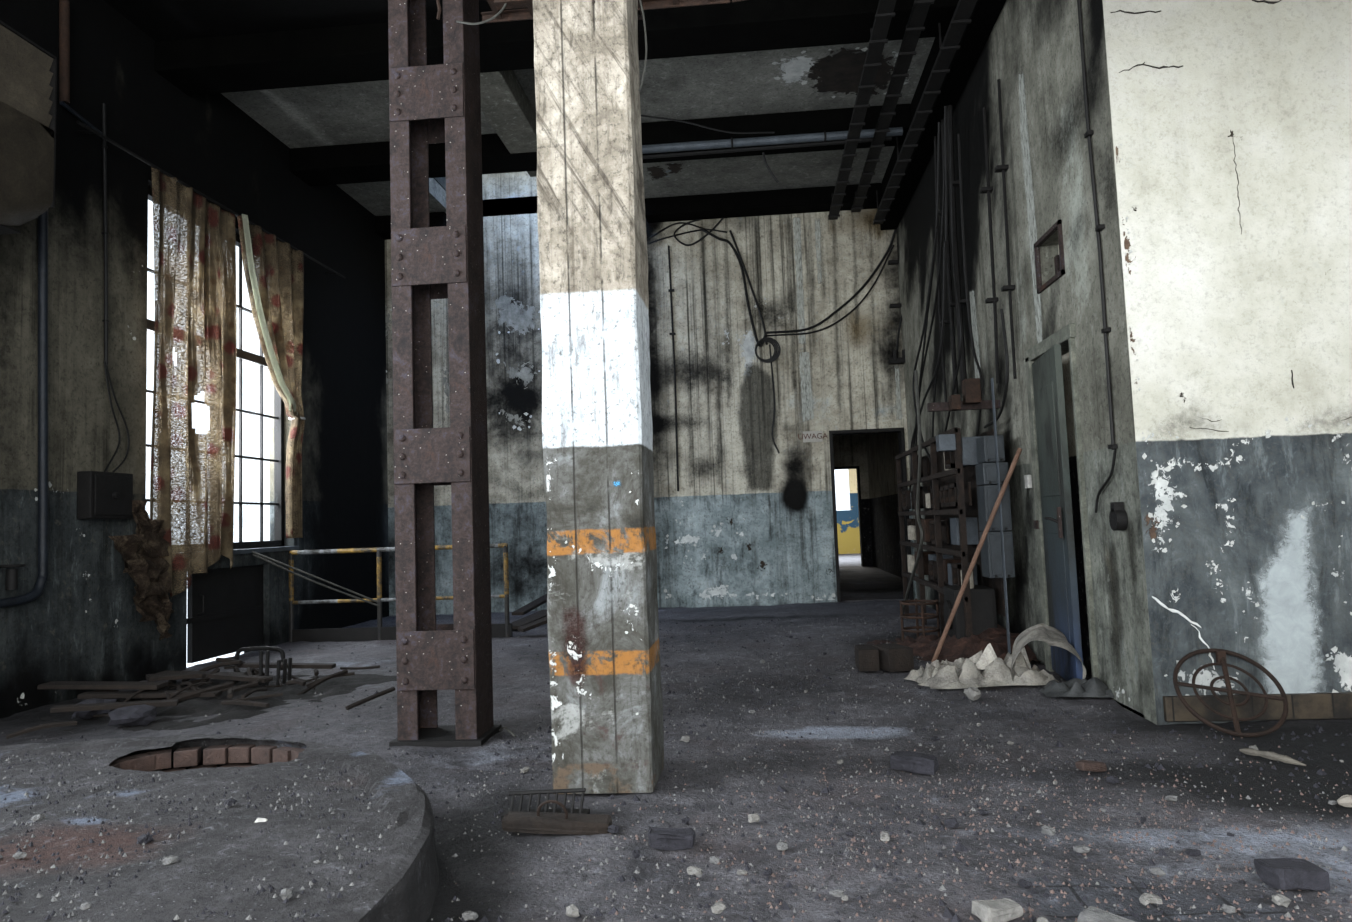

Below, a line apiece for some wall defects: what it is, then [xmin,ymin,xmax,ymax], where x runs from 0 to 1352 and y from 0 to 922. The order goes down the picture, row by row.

crack [1110,8,1161,16]
crack [1252,0,1281,8]
crack [1119,62,1183,73]
water stain [740,366,776,489]
peeling [1142,429,1271,553]
peeling [1205,498,1236,603]
flaking render [1235,501,1352,694]
peeling [549,640,591,710]
rust [564,608,585,678]
peeling [1164,660,1239,696]